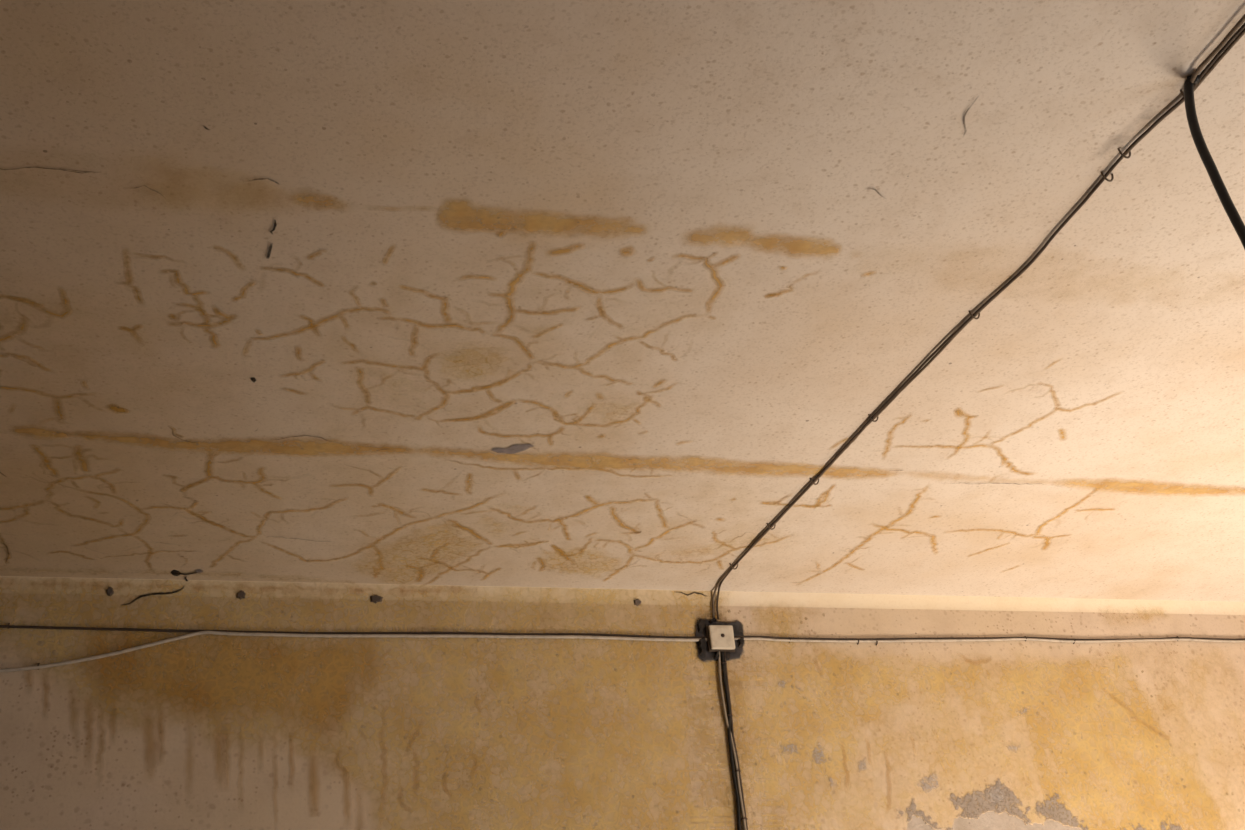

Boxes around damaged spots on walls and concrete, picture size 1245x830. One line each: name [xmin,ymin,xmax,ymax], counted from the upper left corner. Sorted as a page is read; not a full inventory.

crack [267,220,319,284]
water stain [439,202,642,232]
water stain [691,231,838,254]
crack [351,246,680,437]
water stain [86,435,407,455]
crack [2,435,776,605]
water stain [433,451,886,477]
crack [816,419,1112,576]
crack [940,403,1096,485]
water stain [1073,481,1245,494]
water stain [0,581,1217,830]
peeling [897,774,1088,830]